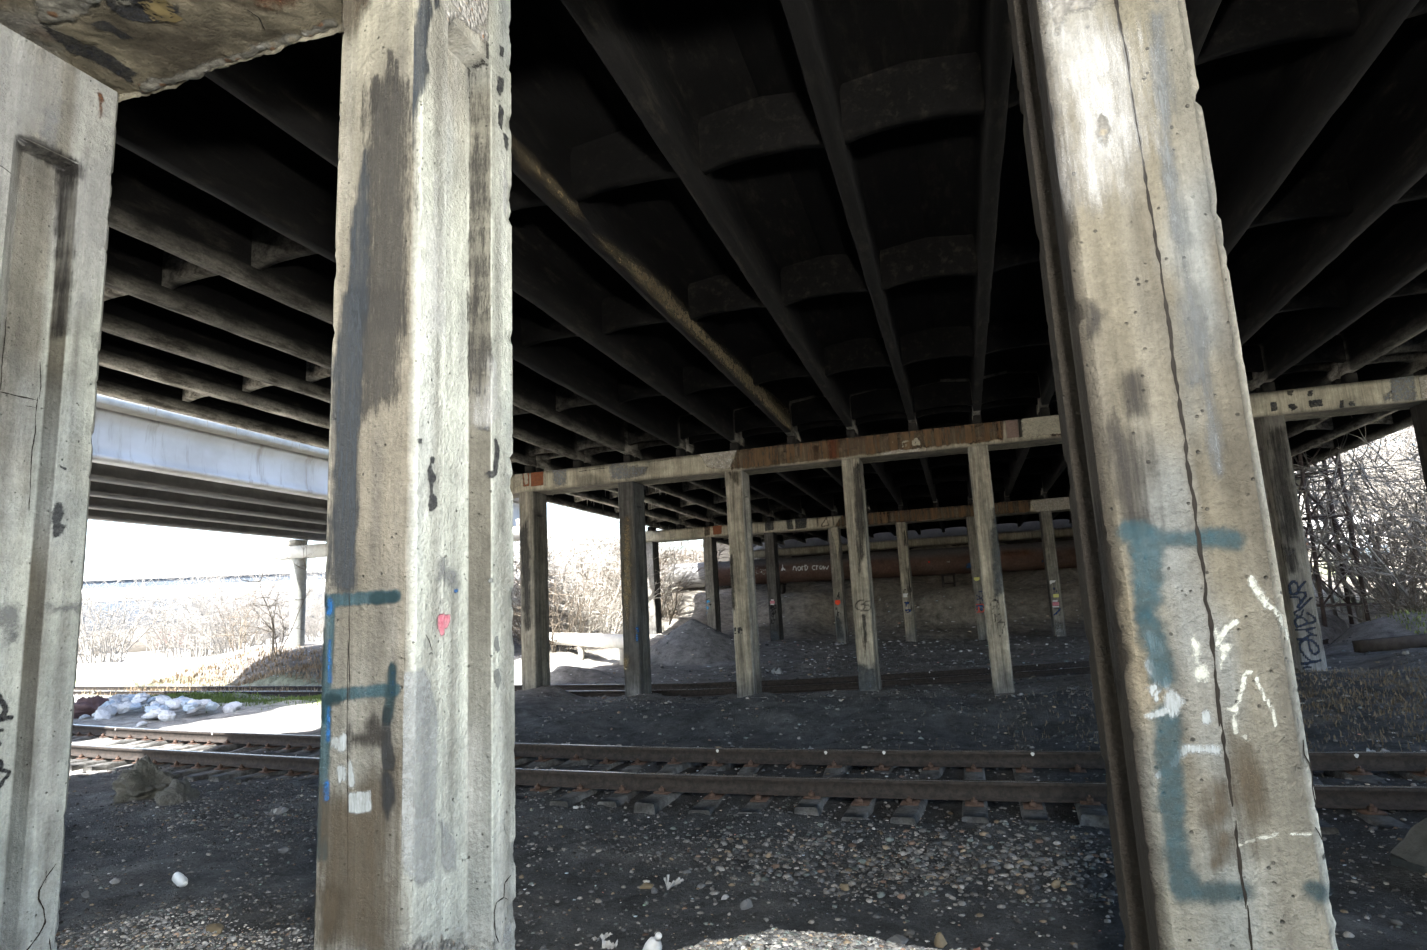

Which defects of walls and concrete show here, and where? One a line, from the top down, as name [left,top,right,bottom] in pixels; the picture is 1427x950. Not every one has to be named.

spalling [34,0,183,39]
spalling [1097,112,1110,145]
water stain [326,0,439,594]
crack [0,317,41,508]
crack [1114,0,1253,950]
water stain [439,560,456,584]